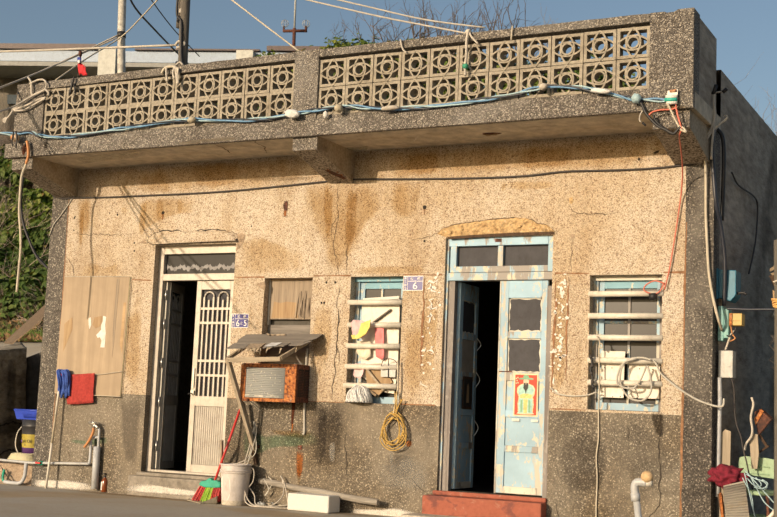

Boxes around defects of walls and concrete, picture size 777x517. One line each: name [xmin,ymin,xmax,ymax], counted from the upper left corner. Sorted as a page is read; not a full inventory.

crack [331,185,348,400]
peeling [549,273,569,393]
crack [649,419,663,517]